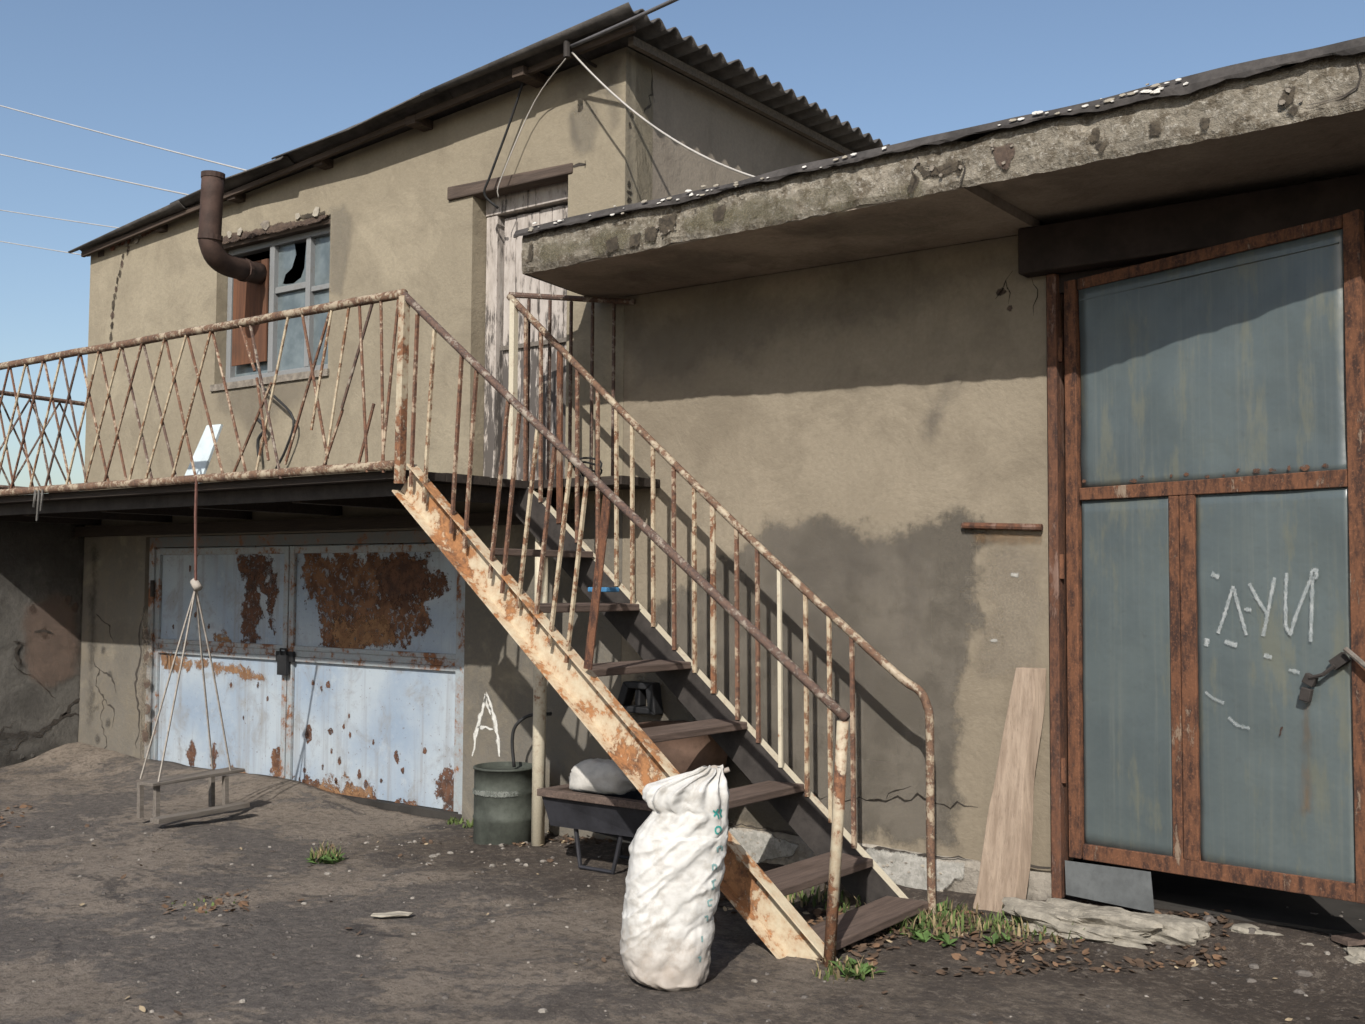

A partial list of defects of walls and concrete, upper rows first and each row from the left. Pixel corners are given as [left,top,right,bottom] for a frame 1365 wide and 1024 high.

peeling [998,78,1189,126]
spalling [1278,86,1303,116]
spalling [907,159,963,193]
spalling [990,143,1015,169]
corrosion [194,546,279,643]
corrosion [298,543,451,650]
crack [0,614,116,756]
leakage [632,659,697,723]
leakage [656,511,989,846]
corrosion [270,714,383,800]
corrosion [434,764,454,811]
crack [818,786,978,809]